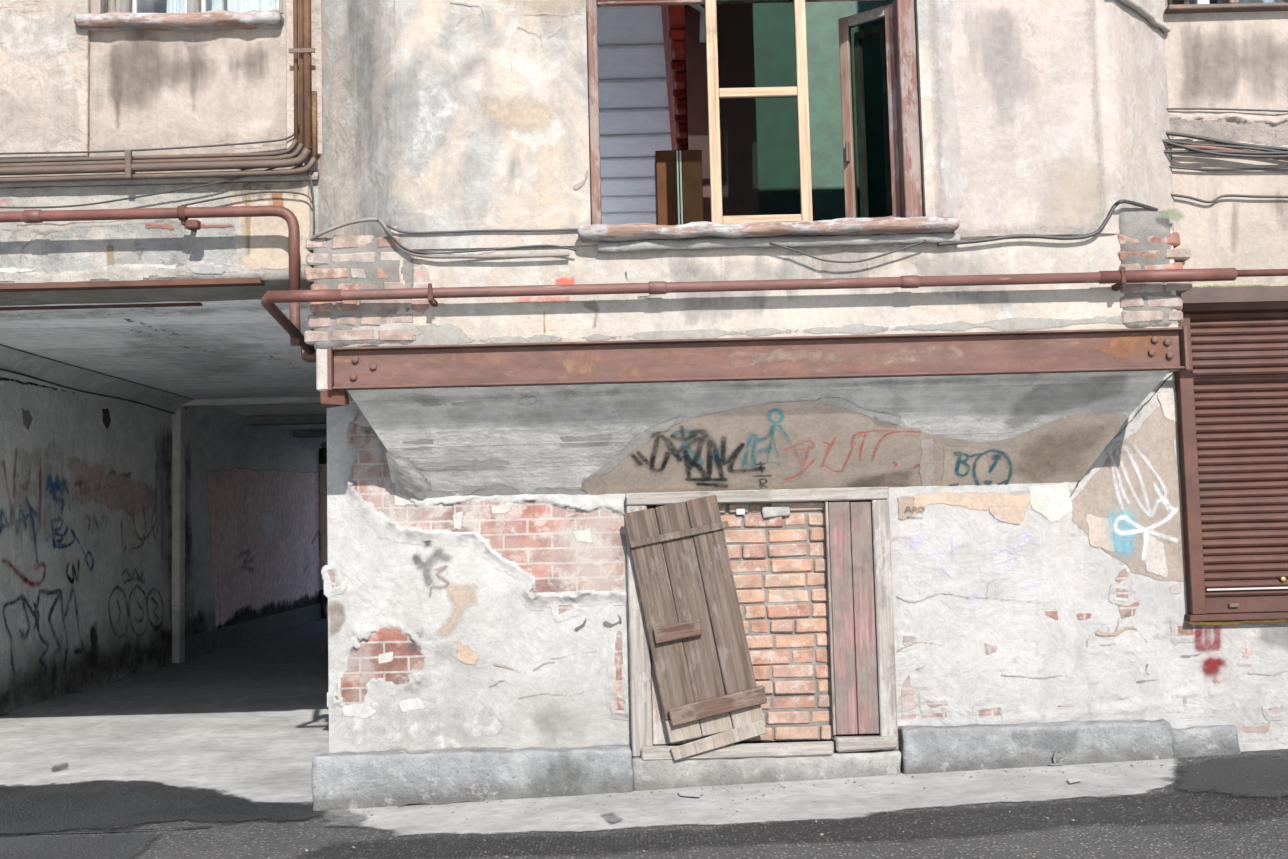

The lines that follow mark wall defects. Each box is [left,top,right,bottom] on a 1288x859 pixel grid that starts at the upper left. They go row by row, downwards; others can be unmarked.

damp [111,31,205,101]
damp [1185,34,1286,97]
spalling [344,226,562,347]
spalling [583,315,1123,341]
peeling [336,391,1186,623]
spalling [321,562,348,598]
spalling [327,585,479,717]
spalling [606,623,631,720]
spalling [1170,617,1199,644]
spalling [973,703,1007,725]